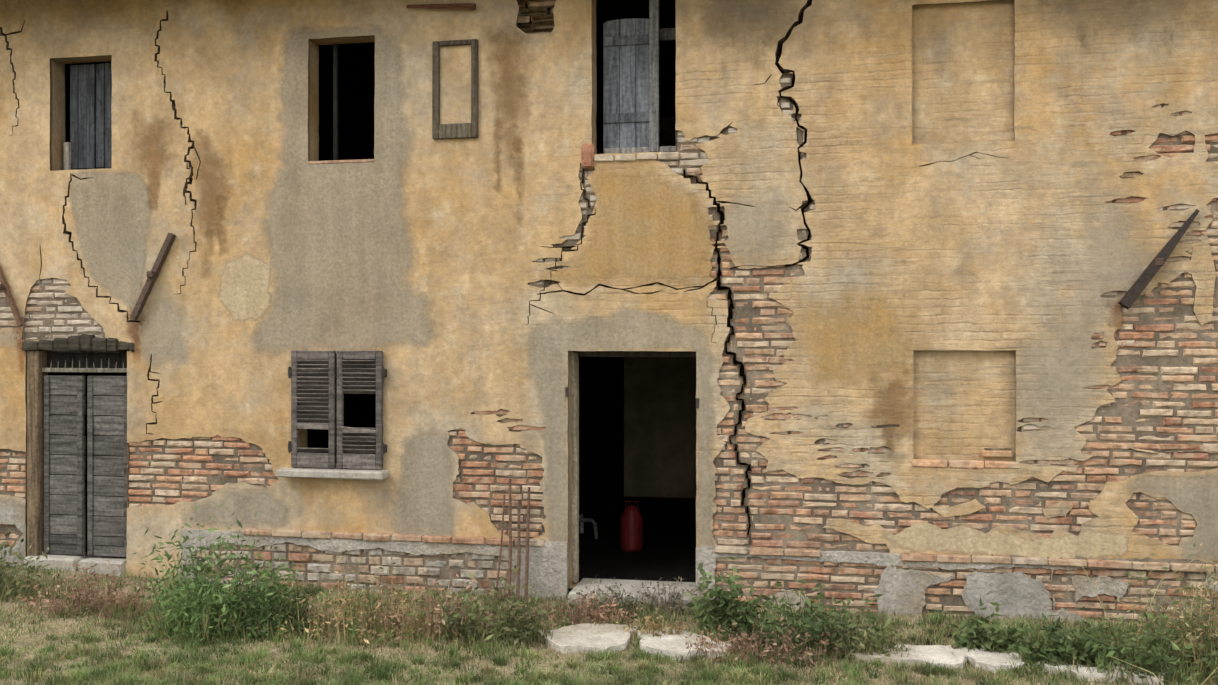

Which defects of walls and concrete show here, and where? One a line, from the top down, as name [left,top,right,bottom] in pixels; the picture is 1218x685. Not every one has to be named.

crack [0,21,25,132]
crack [155,11,201,295]
flaking render [777,74,807,160]
flaking render [1119,131,1218,179]
flaking render [0,278,105,340]
crack [526,0,813,545]
flaking render [706,197,1218,624]
flaking render [0,449,26,498]
flaking render [128,435,279,507]
flaking render [448,409,546,539]
flaking render [0,524,23,546]
flaking render [195,542,517,597]